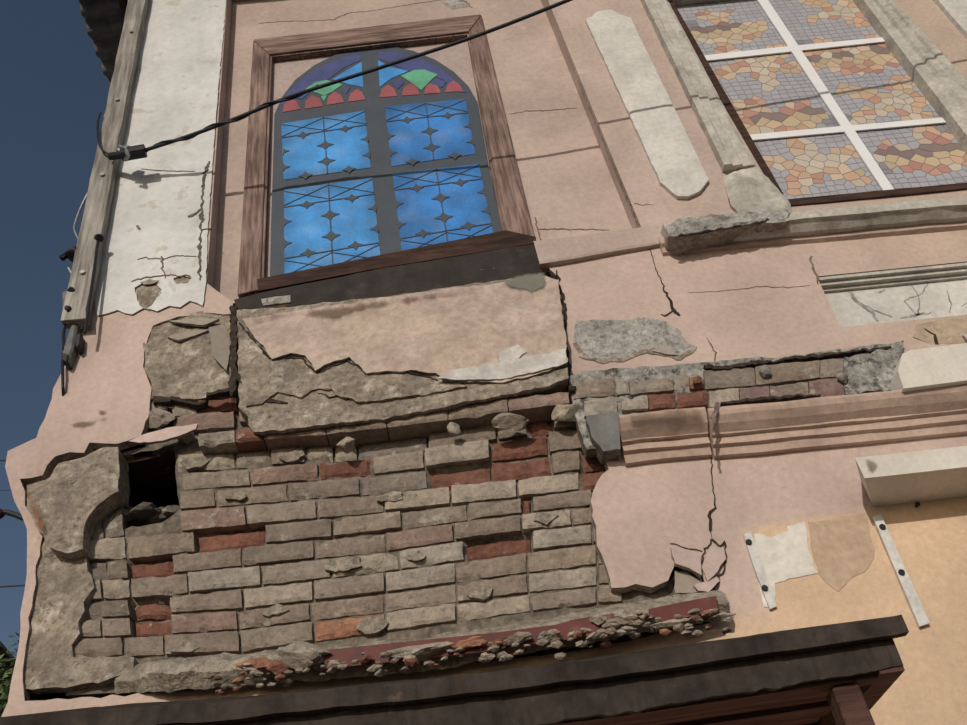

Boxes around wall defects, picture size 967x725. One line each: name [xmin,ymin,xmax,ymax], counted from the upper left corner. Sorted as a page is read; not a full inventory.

crack [131,161,212,282]
peeling [136,279,162,311]
crack [650,250,819,317]
crack [848,283,967,321]
flaking render [24,311,967,699]
crack [670,402,727,595]